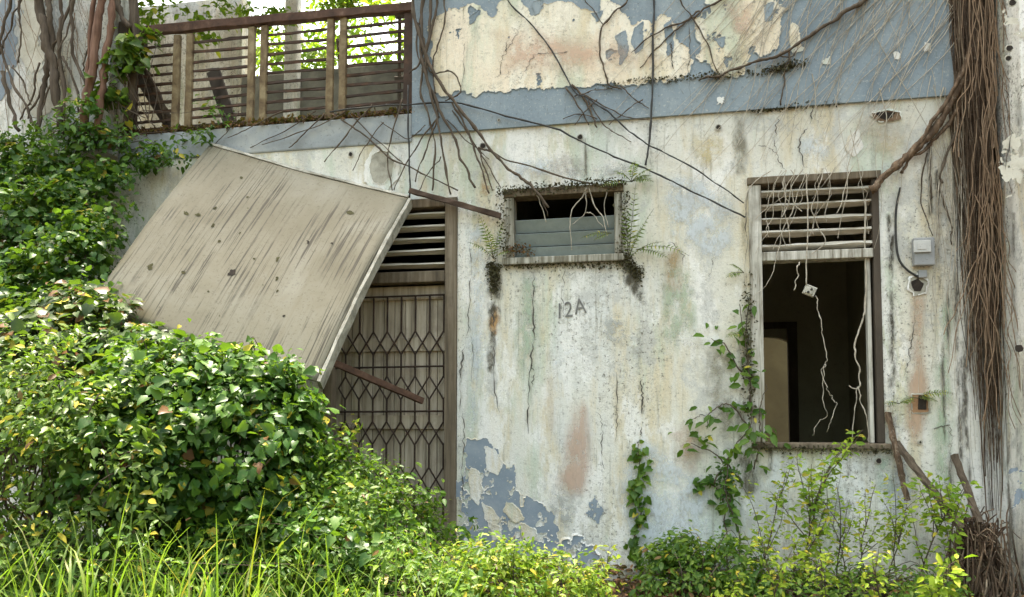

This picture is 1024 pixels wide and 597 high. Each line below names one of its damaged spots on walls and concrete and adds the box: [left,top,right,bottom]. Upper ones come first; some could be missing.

peeling [426,0,804,98]
crack [758,109,813,168]
spalling [870,109,902,123]
peeling [998,133,1024,184]
water stain [625,267,642,301]
crack [459,253,499,491]
crack [527,278,535,434]
peeling [456,437,604,568]